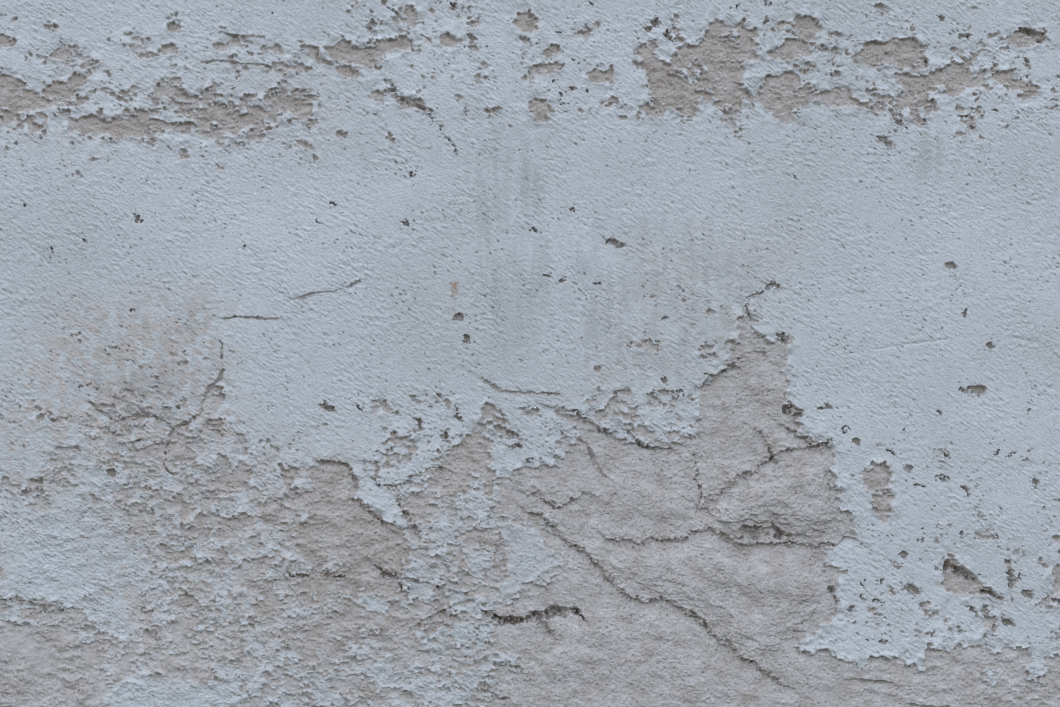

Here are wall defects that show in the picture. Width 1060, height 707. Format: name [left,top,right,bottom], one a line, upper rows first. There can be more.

peeling [0,0,488,161]
peeling [512,10,620,124]
peeling [633,0,1051,135]
peeling [0,312,1060,707]
crack [481,377,854,685]
crack [484,689,511,700]